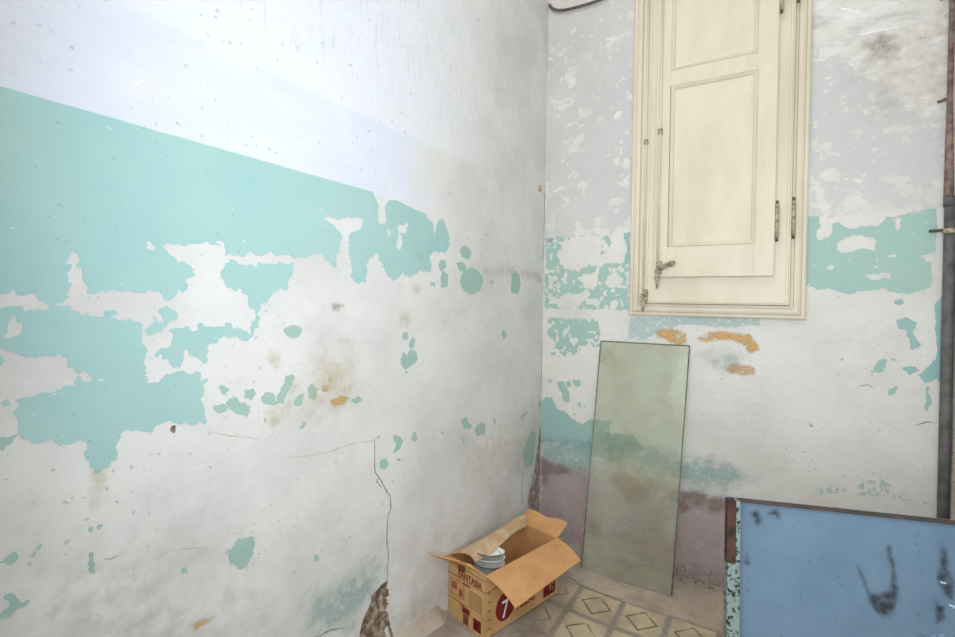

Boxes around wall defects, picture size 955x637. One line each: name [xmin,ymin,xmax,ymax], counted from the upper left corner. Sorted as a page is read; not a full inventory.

peeling [543,0,760,357]
peeling [806,43,946,305]
peeling [0,86,496,474]
rust [657,329,686,344]
rust [698,332,758,352]
rust [728,364,754,375]
peeling [870,297,942,411]
peeling [0,593,30,620]
peeling [226,536,256,570]
crack [284,438,391,580]
flaking render [359,581,389,637]
leakage [529,429,736,587]